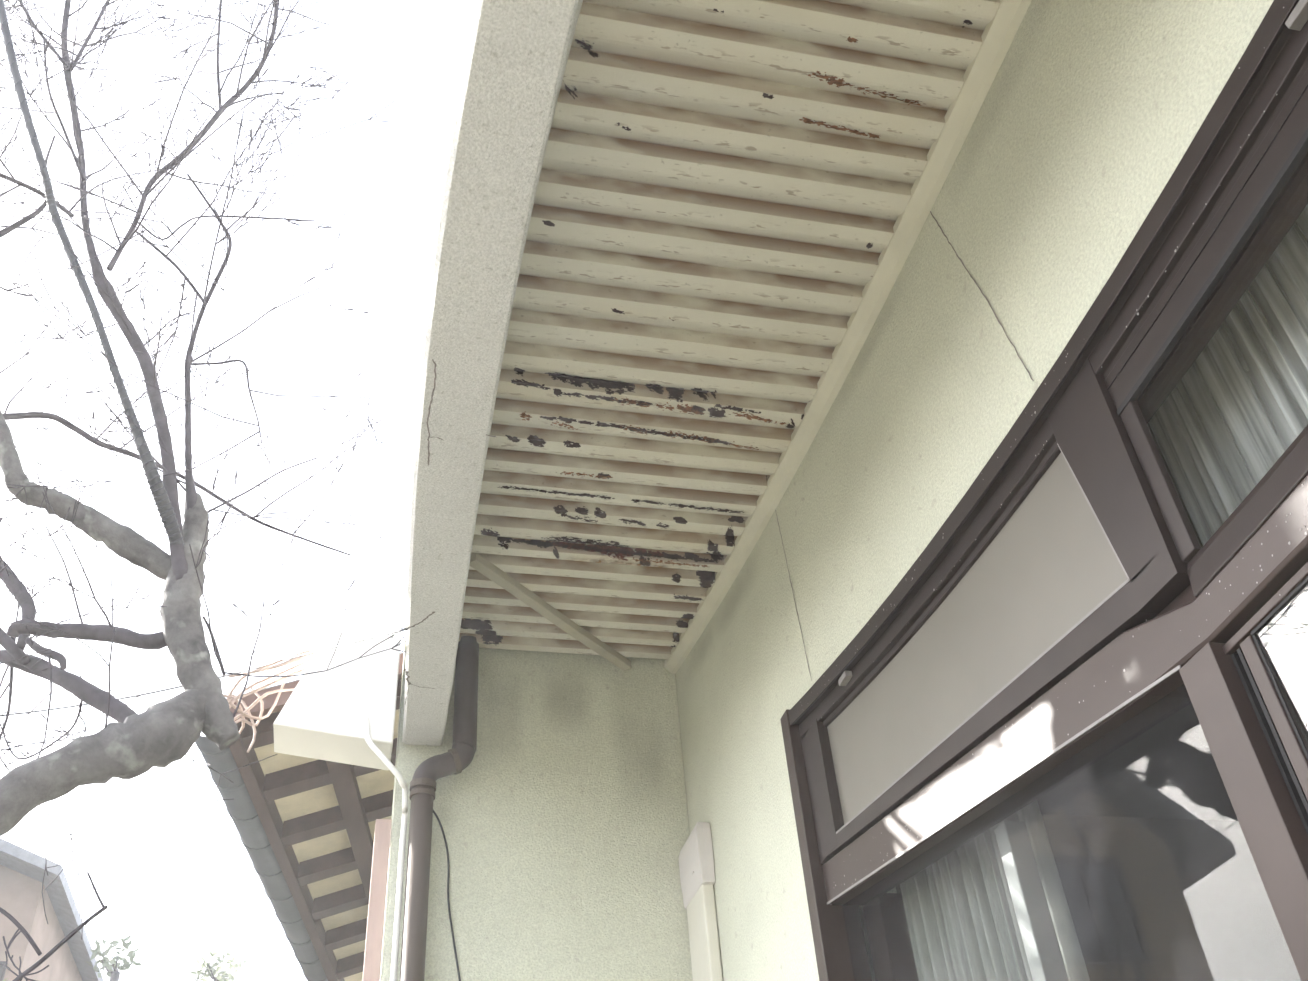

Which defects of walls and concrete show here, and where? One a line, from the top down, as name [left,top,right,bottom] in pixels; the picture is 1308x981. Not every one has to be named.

rust [808,71,924,106]
rust [799,117,879,138]
rust [511,379,786,425]
rust [519,412,759,450]
rust [480,528,720,568]